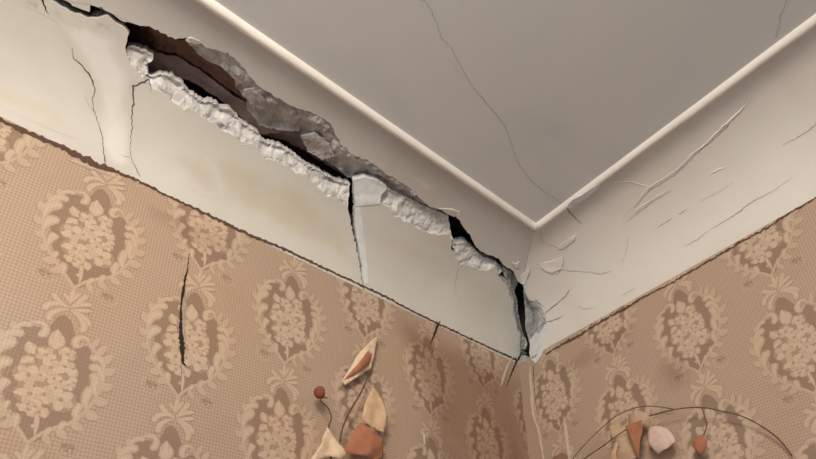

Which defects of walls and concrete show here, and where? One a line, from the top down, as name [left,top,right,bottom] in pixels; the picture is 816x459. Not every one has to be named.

crack [42,0,628,363]
spalling [352,173,387,284]